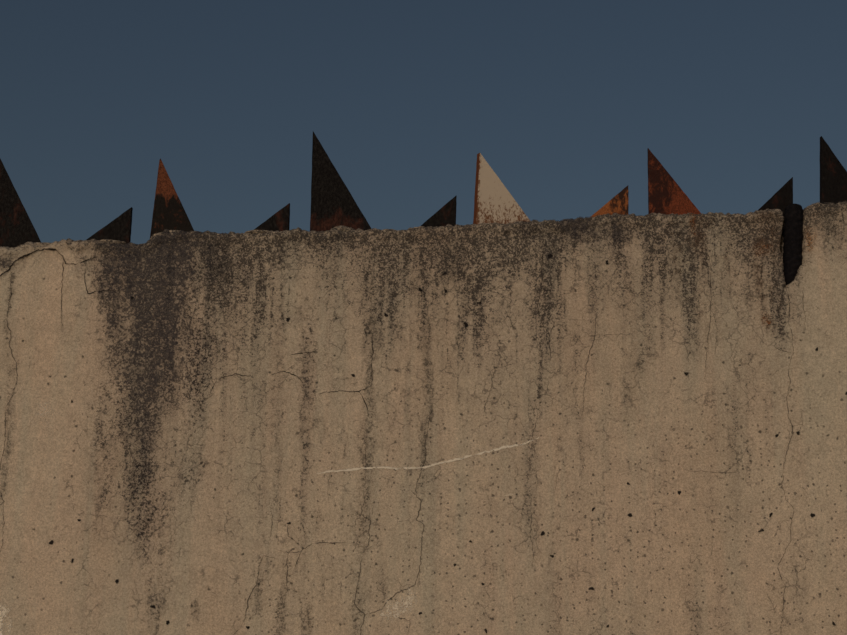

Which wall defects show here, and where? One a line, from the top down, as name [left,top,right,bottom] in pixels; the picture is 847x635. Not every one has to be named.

crack [0,248,117,469]
water stain [78,230,234,557]
water stain [519,213,634,293]
crack [233,513,344,635]
crack [317,408,539,635]